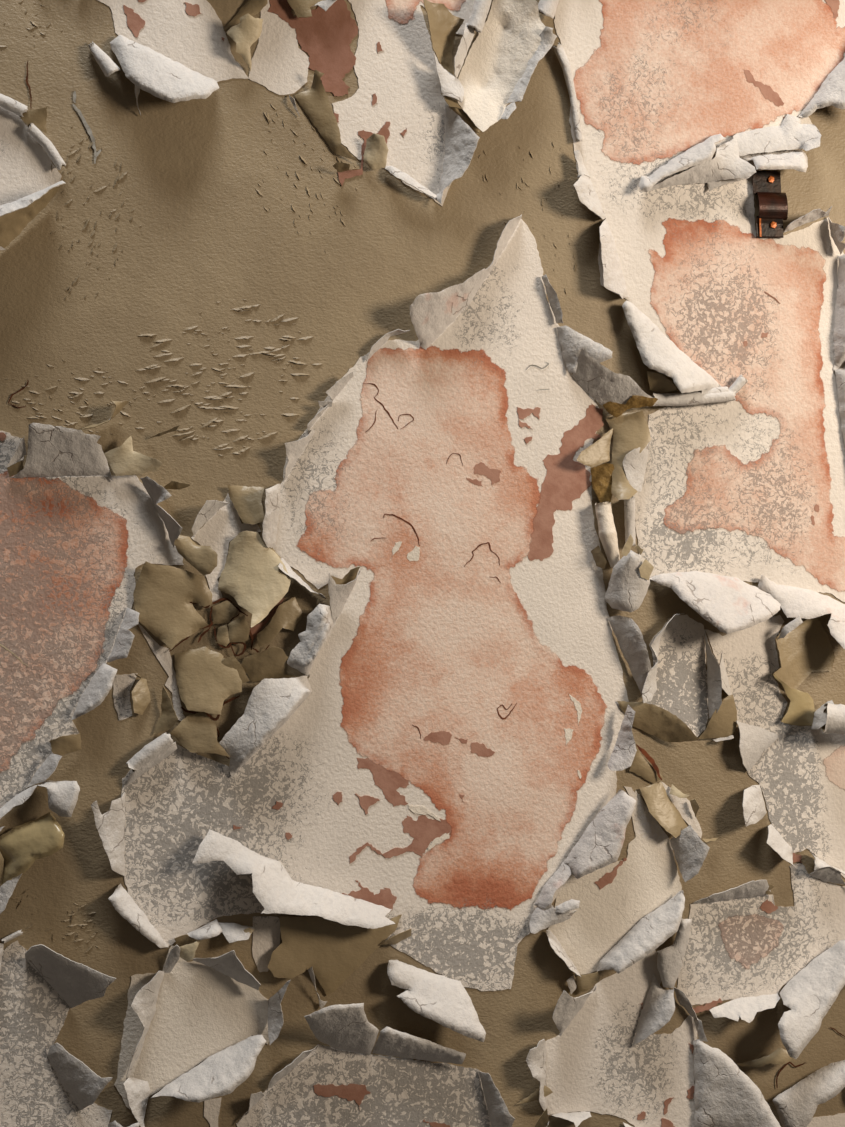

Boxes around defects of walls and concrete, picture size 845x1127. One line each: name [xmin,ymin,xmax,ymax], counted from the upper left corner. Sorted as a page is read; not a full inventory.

peeling [0,94,141,300]
leakage [385,0,466,24]
peeling [98,0,845,649]
leakage [573,0,845,165]
leakage [648,218,845,592]
leakage [0,471,129,773]
leakage [297,346,607,910]
peeling [515,615,845,1127]